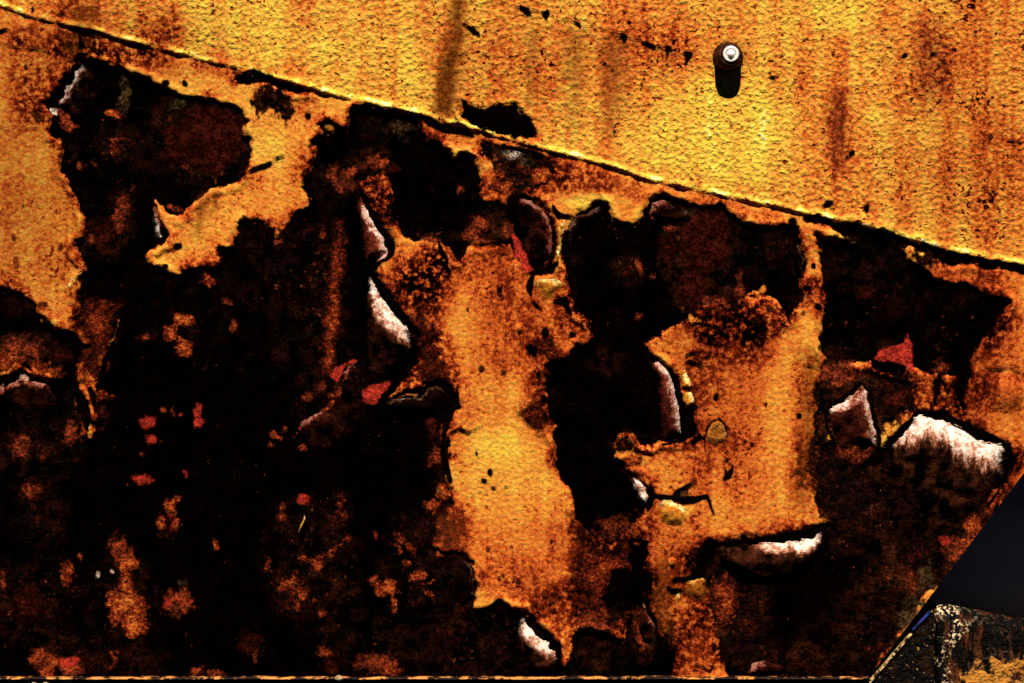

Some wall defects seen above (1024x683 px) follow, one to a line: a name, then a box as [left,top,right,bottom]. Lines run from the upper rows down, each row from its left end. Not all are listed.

corrosion [78,298,124,376]
peeling [0,55,816,677]
corrosion [408,306,452,384]
corrosion [532,335,560,373]
corrosion [519,398,546,437]
peeling [687,221,1018,677]
corrosion [567,513,632,611]